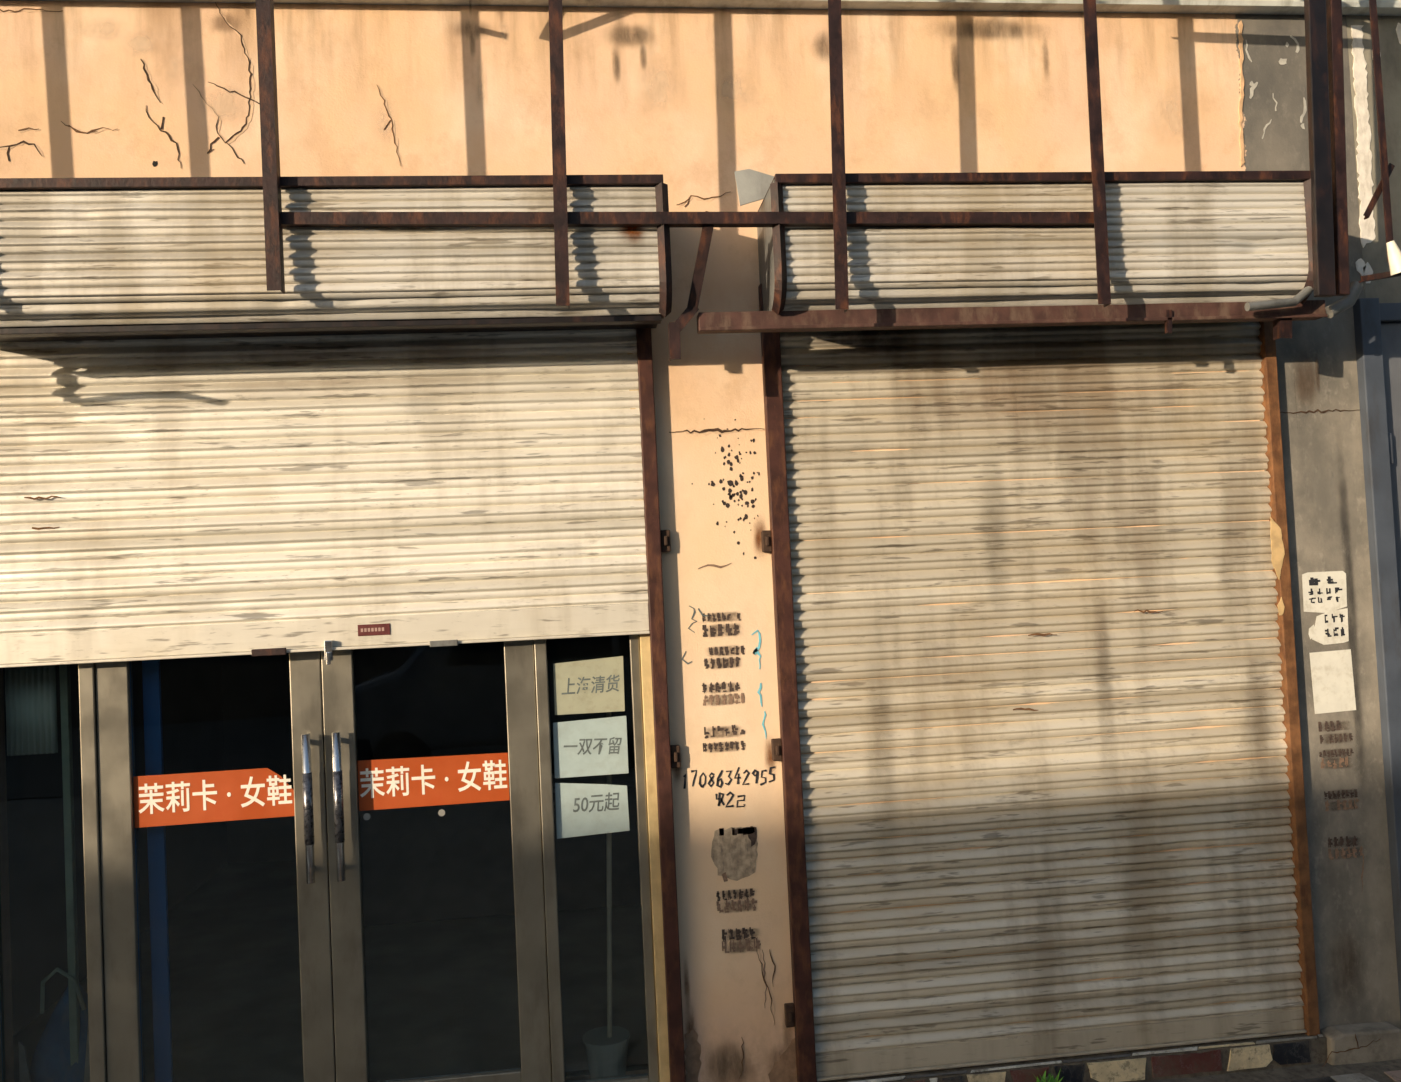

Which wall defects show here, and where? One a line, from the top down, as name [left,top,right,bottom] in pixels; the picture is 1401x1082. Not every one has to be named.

leakage [615,29,644,74]
peeling [1279,36,1300,65]
crack [0,2,260,166]
spalling [1238,21,1258,167]
crack [377,86,402,167]
corrosion [623,227,641,239]
crack [669,428,765,436]